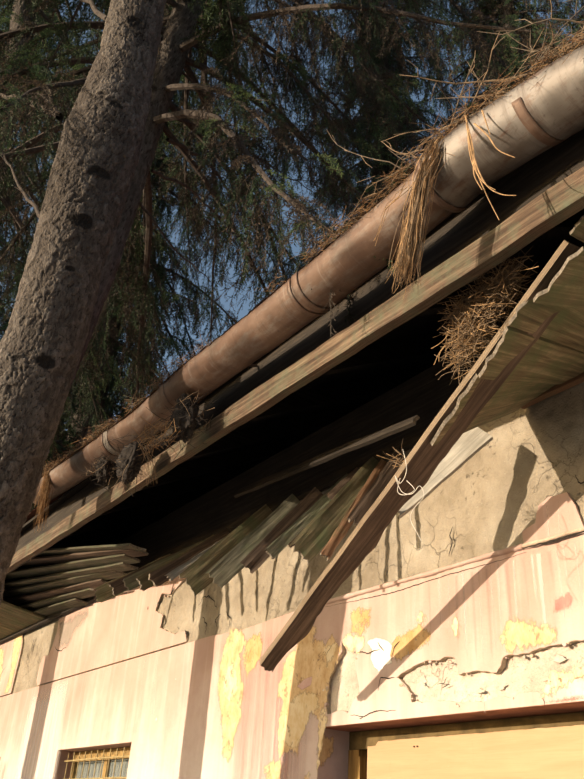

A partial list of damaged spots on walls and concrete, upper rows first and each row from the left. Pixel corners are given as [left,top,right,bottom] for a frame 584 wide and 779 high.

flaking render [331,382,584,598]
flaking render [0,618,59,694]
flaking render [157,524,357,763]
peeling [264,607,370,779]
peeling [390,611,430,660]
flaking render [399,619,584,707]